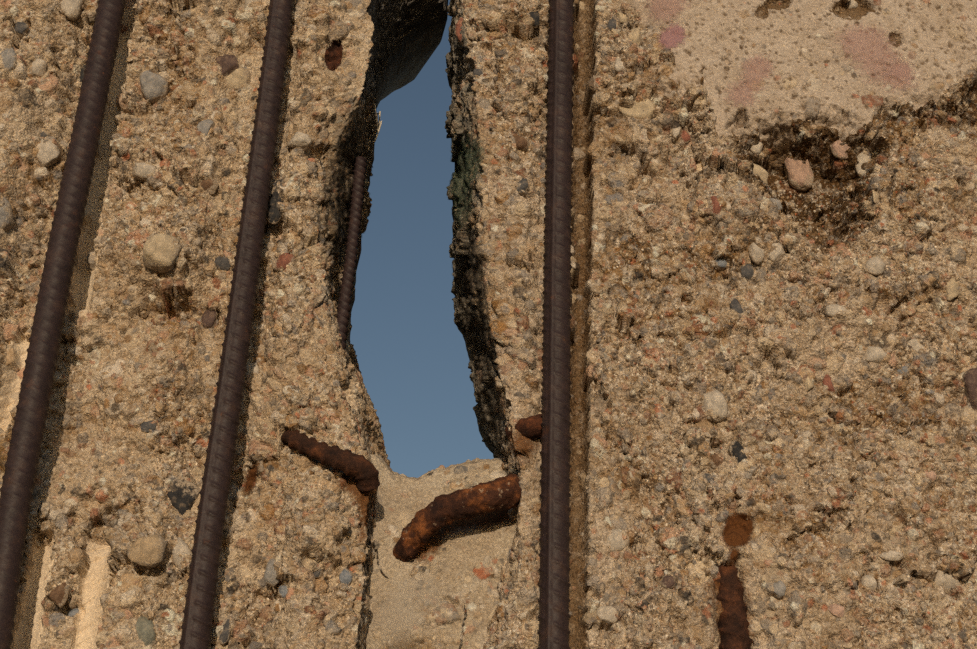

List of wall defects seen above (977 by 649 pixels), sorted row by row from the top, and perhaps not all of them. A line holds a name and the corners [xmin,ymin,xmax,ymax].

peeling [626,0,977,259]
corrosion [281,429,380,538]
corrosion [393,414,542,562]
corrosion [722,512,754,631]